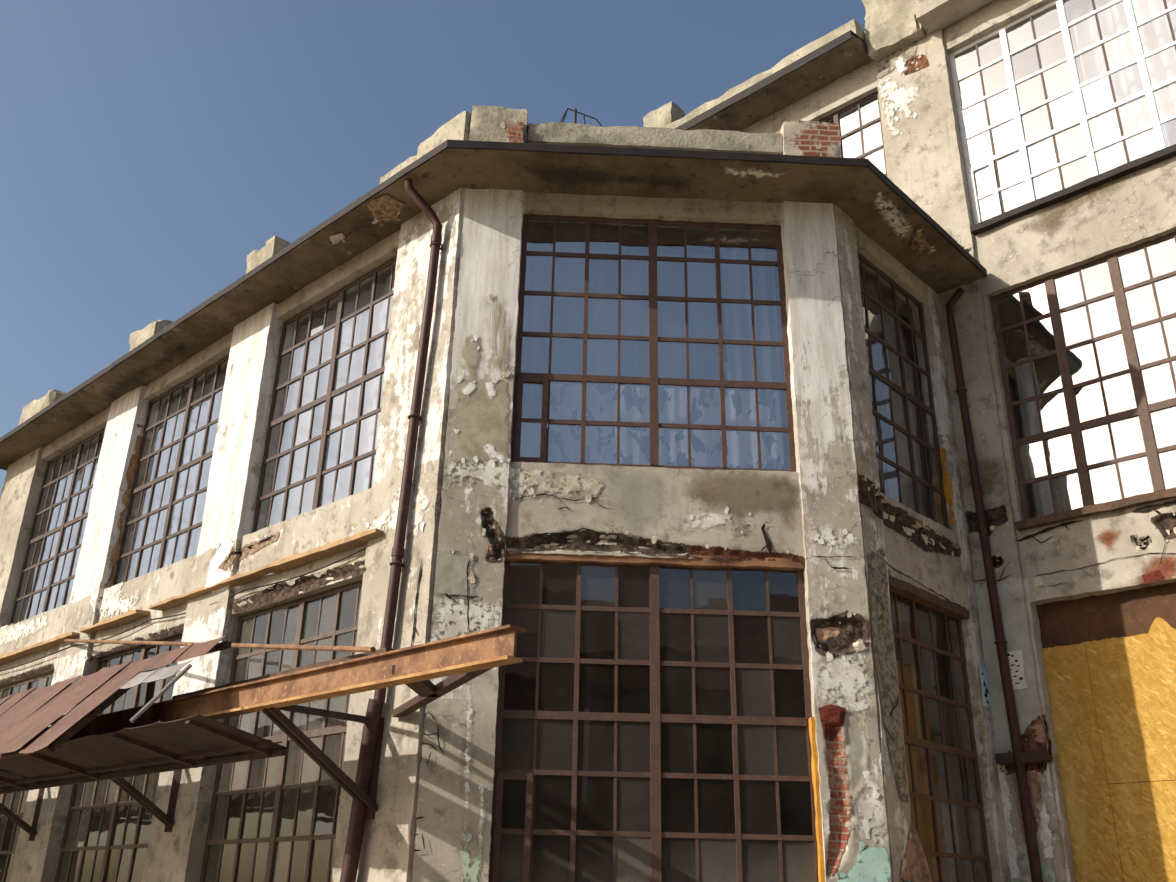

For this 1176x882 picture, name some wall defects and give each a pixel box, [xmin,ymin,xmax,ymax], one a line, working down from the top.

peeling [877,41,929,136]
peeling [447,293,603,503]
spalling [205,531,366,614]
spalling [430,506,805,642]
leakage [695,477,795,509]
peeling [806,524,858,548]
spalling [858,475,961,558]
spalling [1133,512,1176,567]
spalling [809,549,932,882]
peeling [460,700,485,882]
spalling [997,715,1057,882]